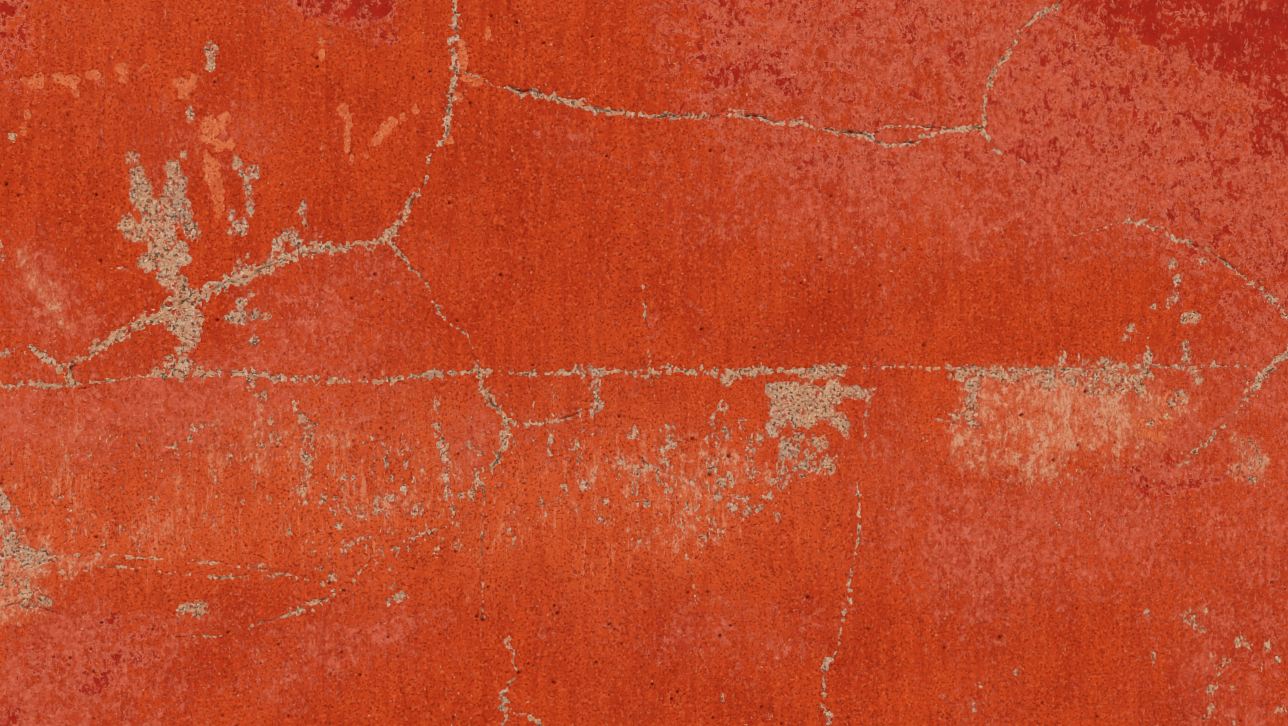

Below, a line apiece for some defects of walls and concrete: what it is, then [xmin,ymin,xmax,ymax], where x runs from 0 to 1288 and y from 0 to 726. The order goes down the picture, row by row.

flaking render [117,39,309,376]
crack [0,0,1288,507]
peeling [0,361,877,645]
crack [478,523,486,619]
crack [819,482,862,726]
peeling [913,257,1218,539]